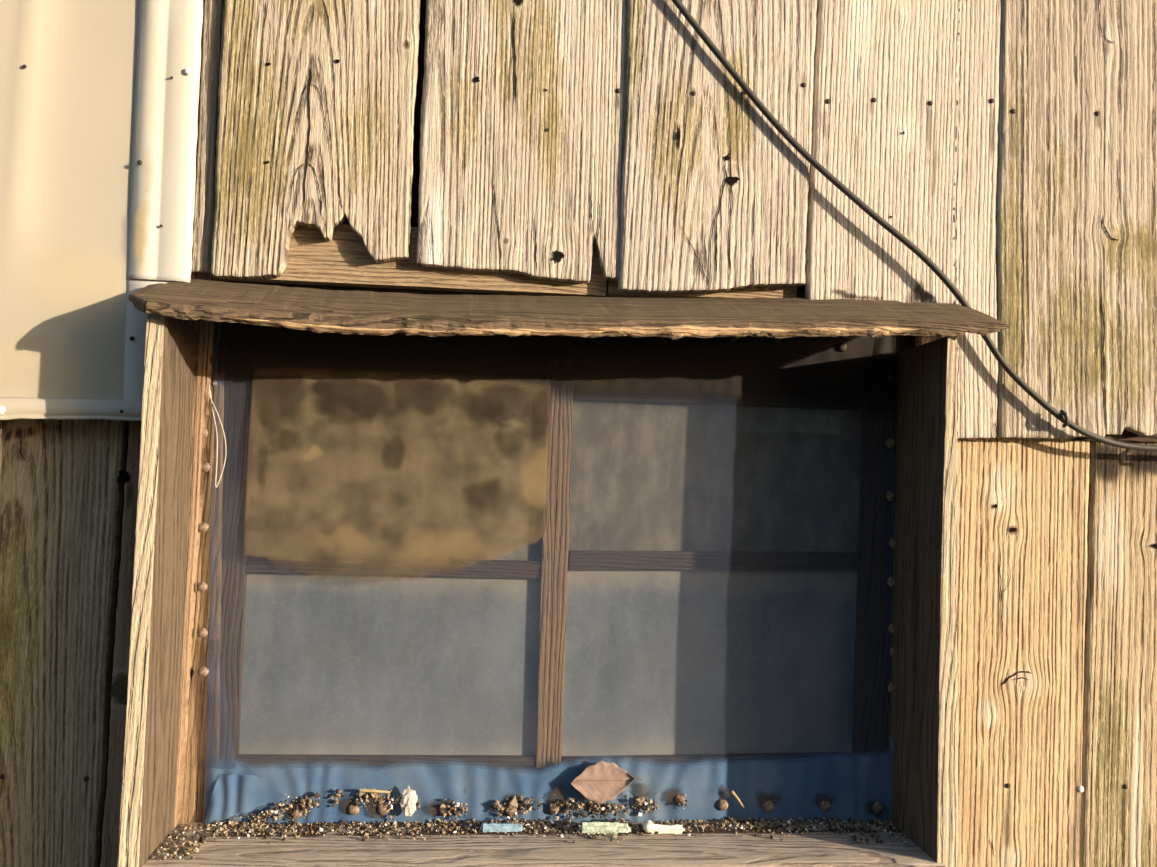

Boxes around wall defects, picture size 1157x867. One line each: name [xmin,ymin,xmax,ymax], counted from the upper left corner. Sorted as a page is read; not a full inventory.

crack [286,45,342,224]
crack [679,153,733,288]